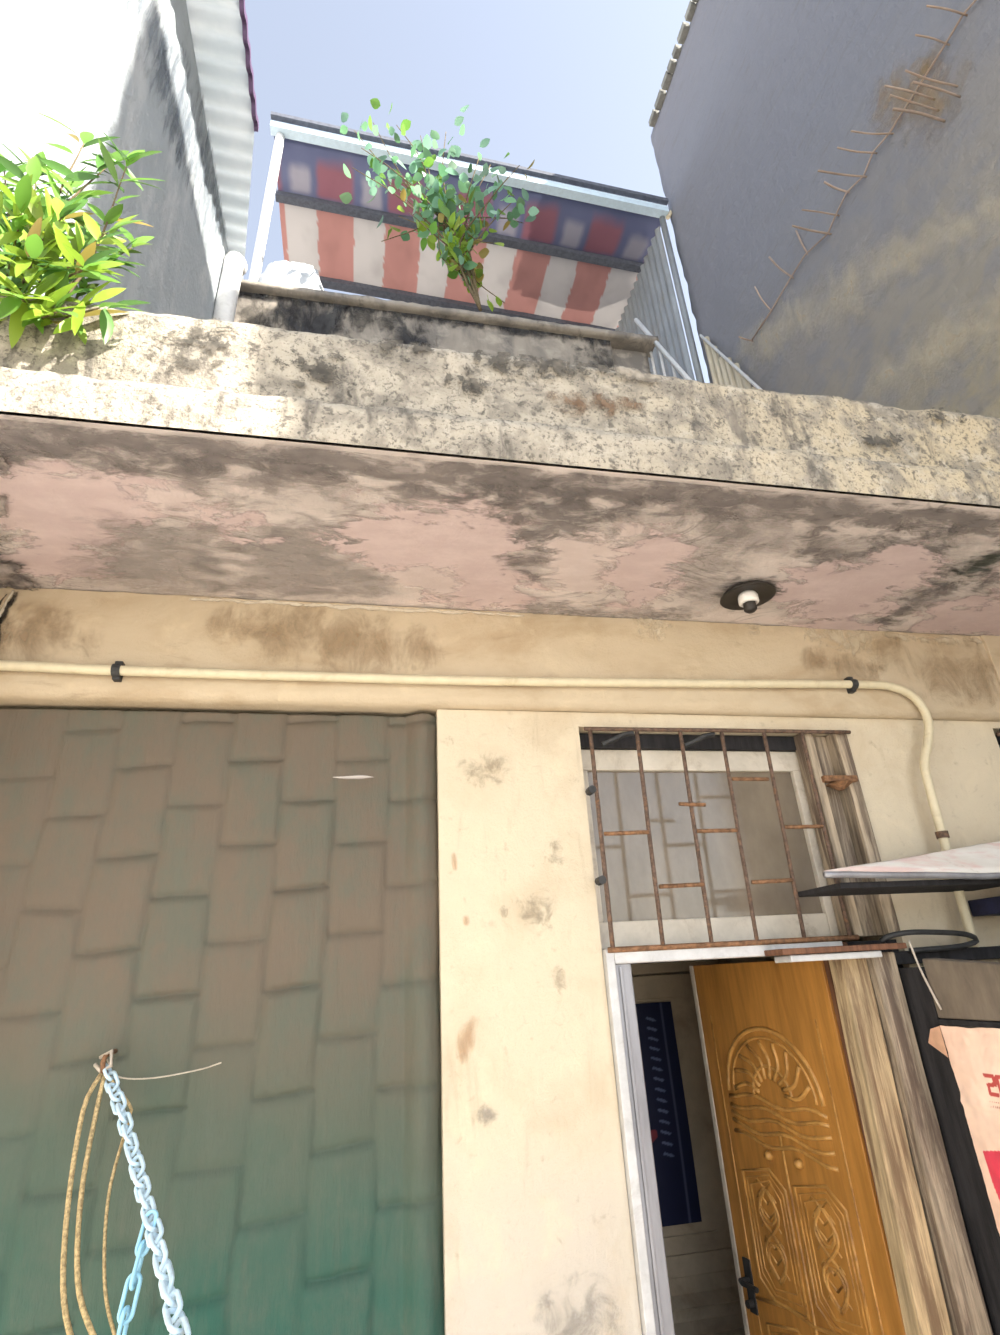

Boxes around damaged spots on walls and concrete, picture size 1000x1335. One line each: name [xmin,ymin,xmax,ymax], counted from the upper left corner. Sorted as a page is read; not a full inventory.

damp [151,291,615,399]
damp [927,407,967,423]
damp [0,419,1000,645]
crack [0,590,18,640]
damp [254,623,388,659]